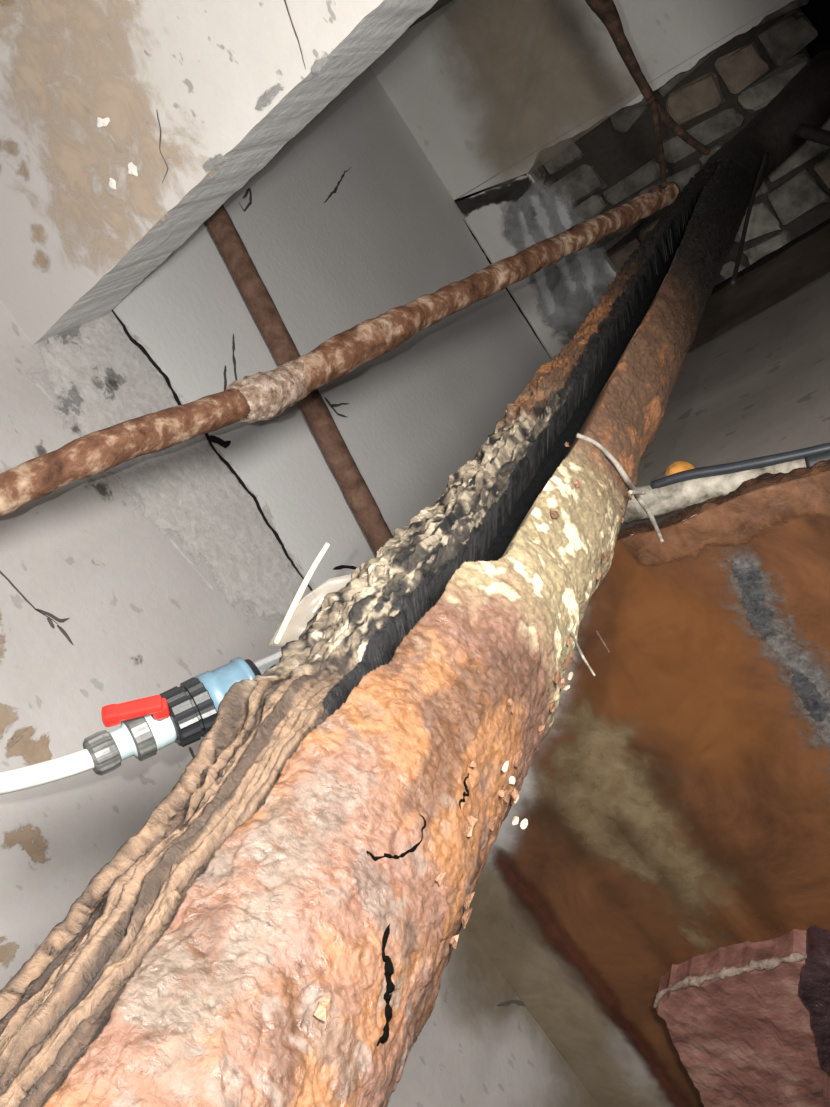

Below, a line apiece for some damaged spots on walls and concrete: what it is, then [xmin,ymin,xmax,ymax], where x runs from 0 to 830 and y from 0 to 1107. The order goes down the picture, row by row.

leakage [0,0,181,268]
leakage [530,243,615,345]
crack [111,310,181,405]
corrosion [205,204,393,555]
crack [205,433,321,607]
leakage [727,557,830,747]
peeling [0,704,52,765]
peeling [5,825,48,863]
corrosion [496,471,830,1107]
peeling [0,937,19,967]
crack [377,924,395,1046]
corrosion [449,892,475,949]